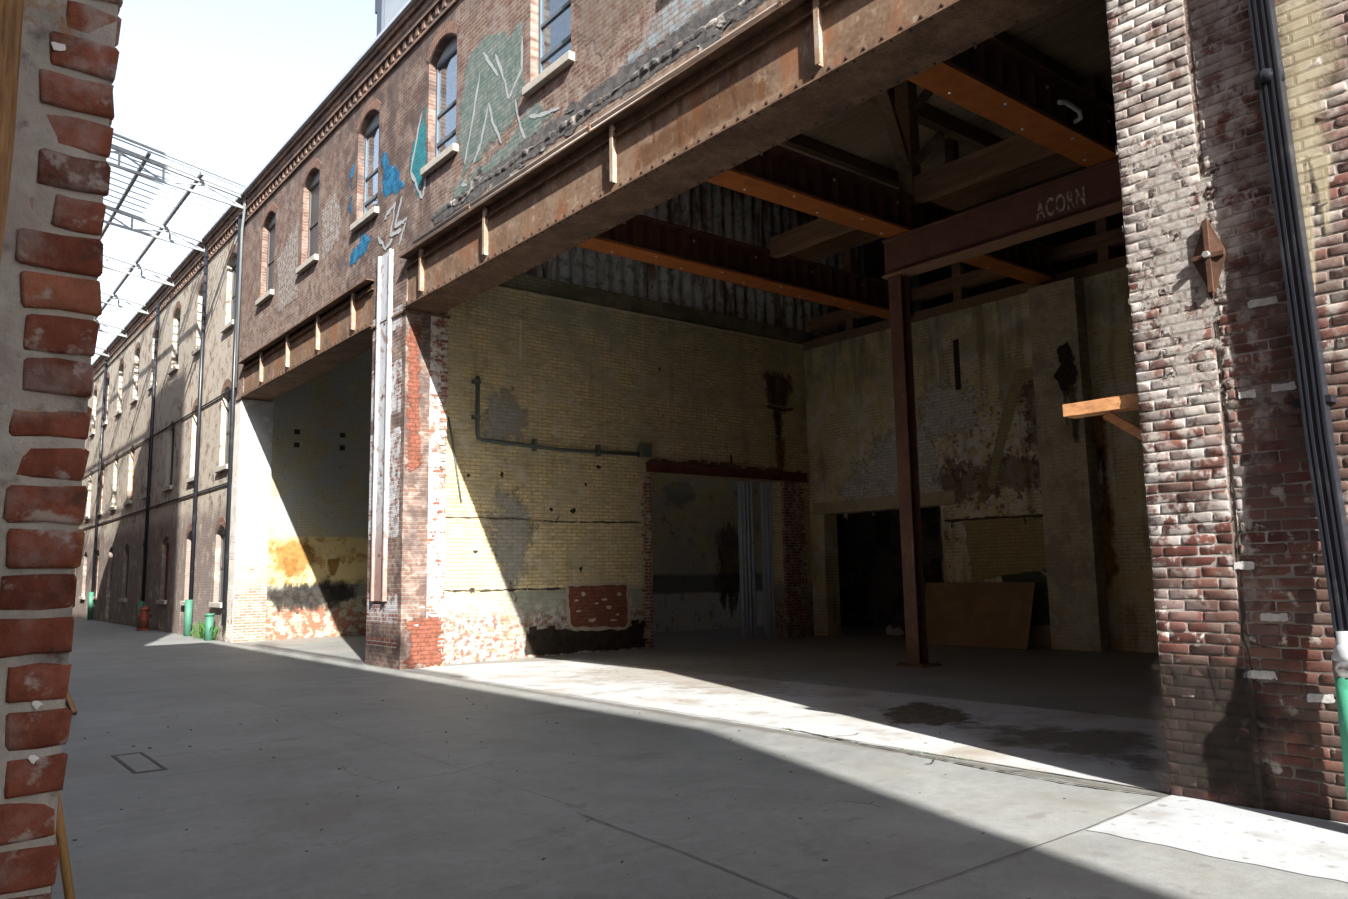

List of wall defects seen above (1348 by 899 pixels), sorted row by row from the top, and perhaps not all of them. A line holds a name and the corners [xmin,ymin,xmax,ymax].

spalling [405,323,423,472]
spalling [438,324,448,477]
spalling [916,380,1041,510]
flaking render [566,567,630,631]
damp [1159,664,1275,803]